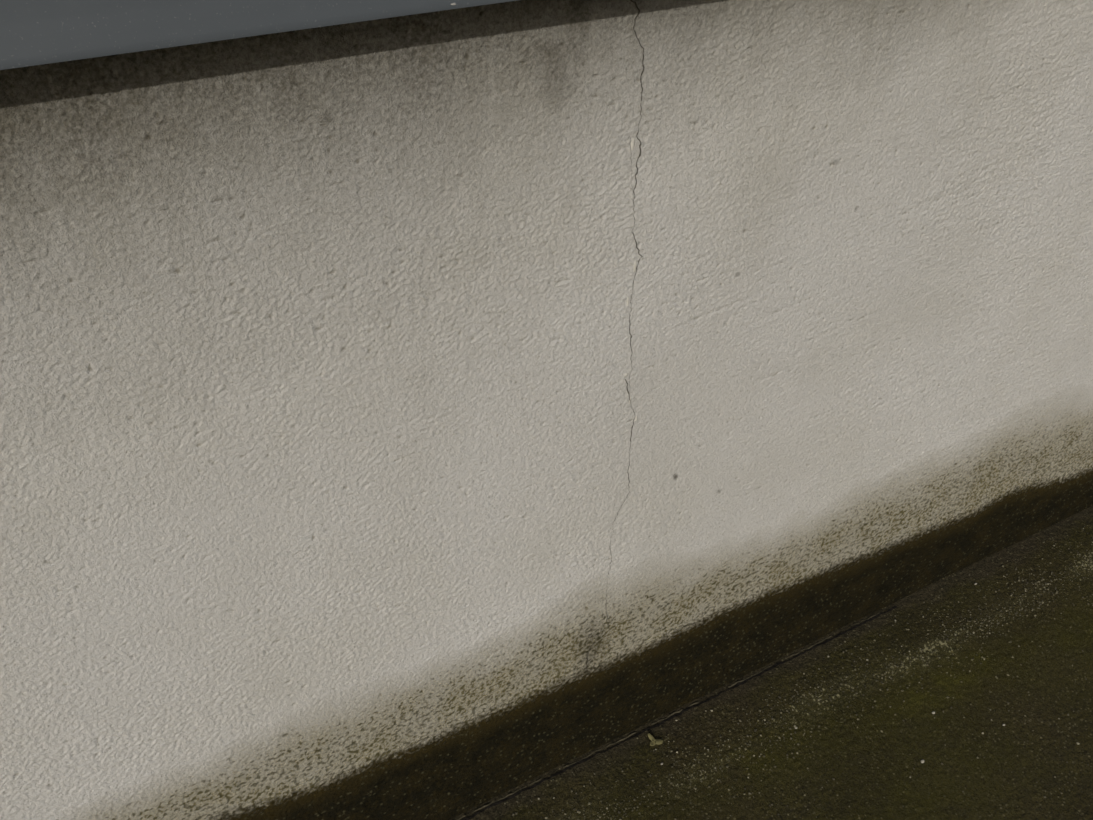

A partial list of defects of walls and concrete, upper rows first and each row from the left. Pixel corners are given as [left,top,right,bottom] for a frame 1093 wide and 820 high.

damp [104,413,1093,820]
crack [586,0,644,670]